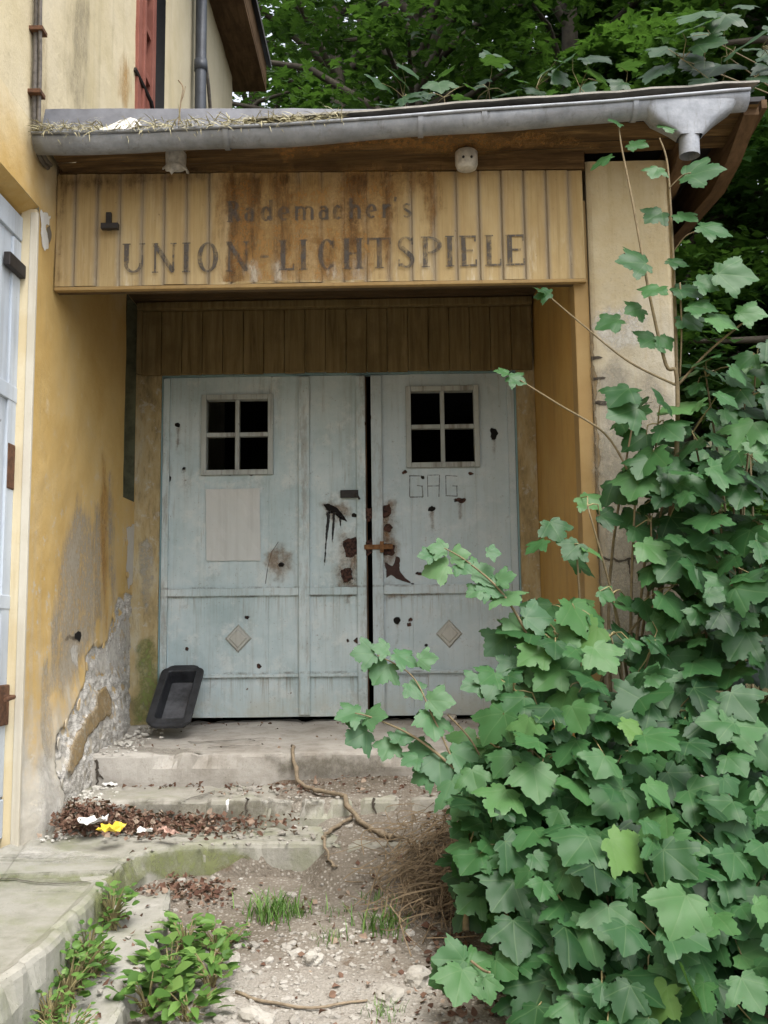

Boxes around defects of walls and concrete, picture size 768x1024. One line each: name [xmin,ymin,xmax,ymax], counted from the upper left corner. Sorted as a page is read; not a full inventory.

water stain [39,498,113,839]
flaking render [55,524,197,811]
rust [338,502,396,587]